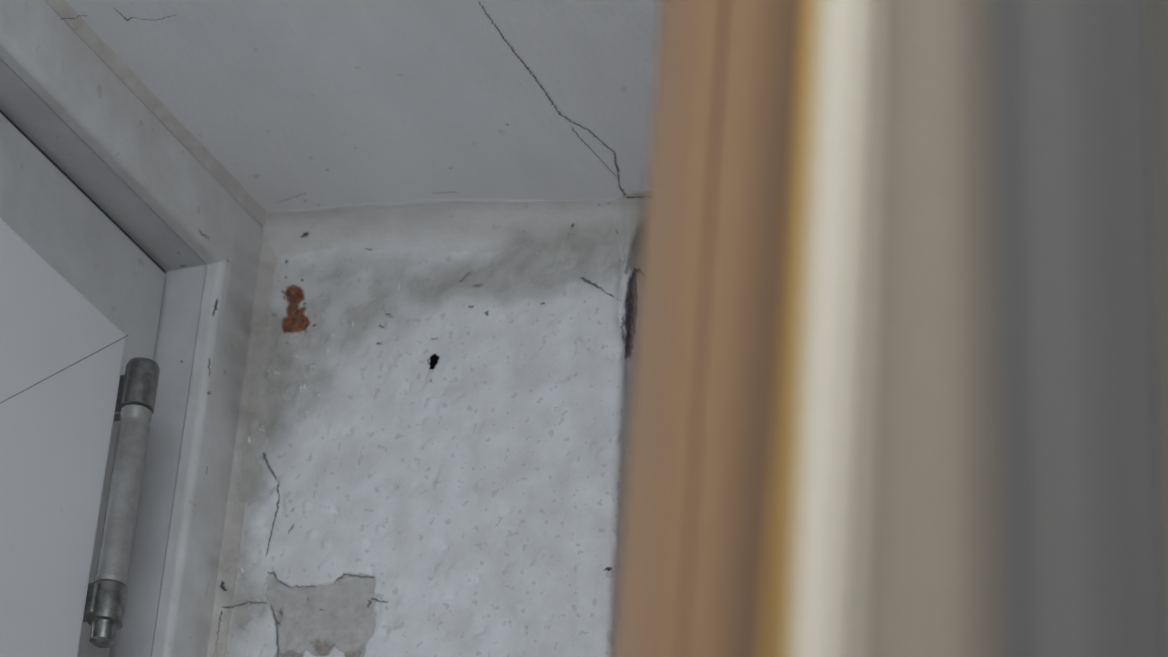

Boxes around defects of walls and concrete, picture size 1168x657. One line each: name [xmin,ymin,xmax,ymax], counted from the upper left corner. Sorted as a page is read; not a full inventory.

crack [479,2,626,196]
rust [282,277,316,344]
peeling [267,572,377,657]